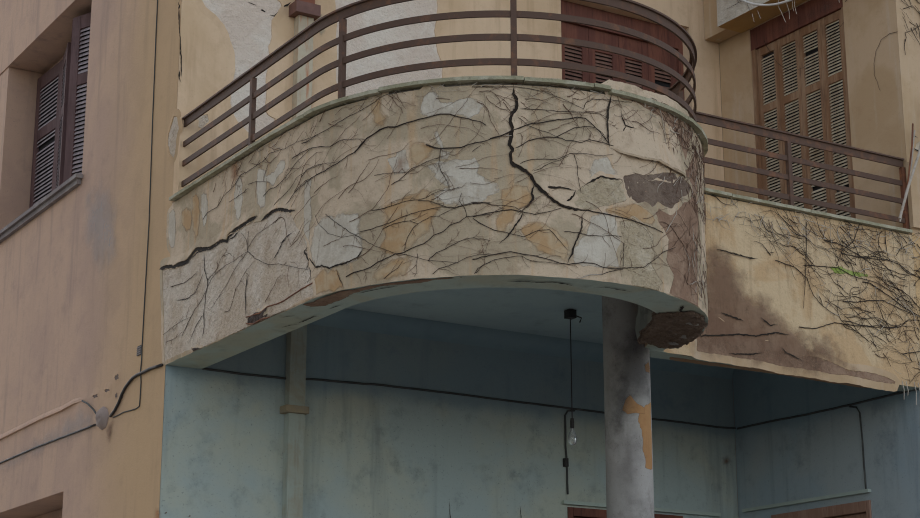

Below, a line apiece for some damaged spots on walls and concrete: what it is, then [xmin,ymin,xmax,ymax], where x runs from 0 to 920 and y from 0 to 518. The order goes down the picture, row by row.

spalling [160,0,900,392]
crack [500,88,622,262]
crack [159,198,395,339]
water stain [700,251,831,366]
peeling [622,395,652,470]